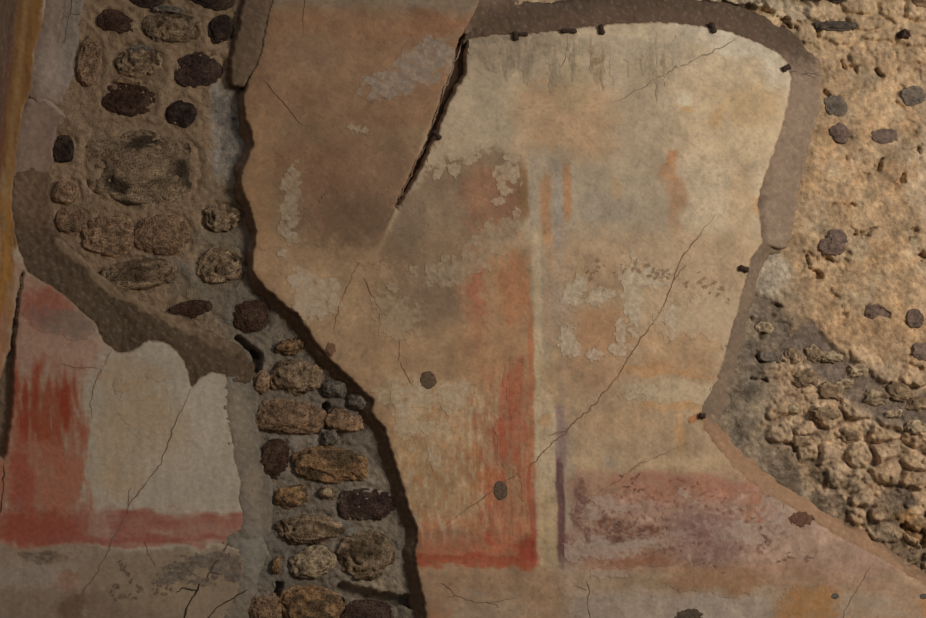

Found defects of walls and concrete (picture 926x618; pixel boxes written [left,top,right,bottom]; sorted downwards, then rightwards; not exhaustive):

spalling [48,0,485,618]
crack [387,36,465,221]
peeling [409,153,525,289]
crack [447,217,714,524]
crack [615,36,740,102]
spalling [557,0,926,579]
crack [67,388,191,618]